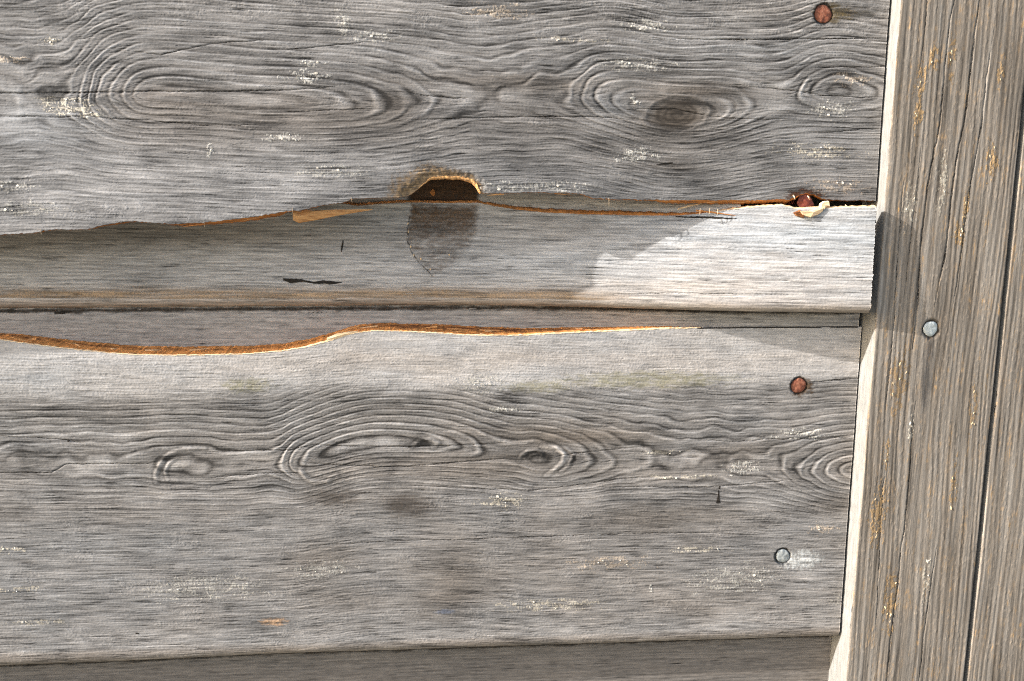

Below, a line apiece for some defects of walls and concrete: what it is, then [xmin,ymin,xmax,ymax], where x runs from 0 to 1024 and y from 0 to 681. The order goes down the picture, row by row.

crack [4,192,876,235]
water stain [407,205,475,272]
crack [0,292,860,356]